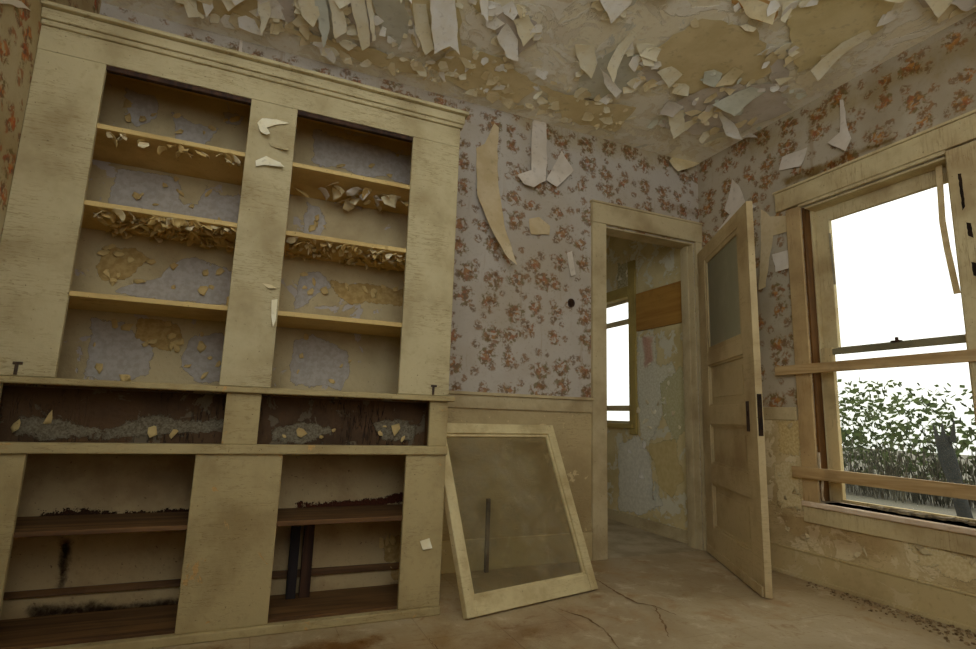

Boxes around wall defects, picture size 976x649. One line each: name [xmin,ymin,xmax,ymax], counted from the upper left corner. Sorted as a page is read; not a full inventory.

peeling [917,0,976,23]
peeling [175,0,904,147]
peeling [106,112,241,167]
peeling [256,118,289,167]
peeling [93,169,241,306]
peeling [285,129,411,309]
peeling [83,318,224,383]
peeling [289,333,352,391]
peeling [11,410,224,441]
flaking render [618,332,676,516]
crack [561,609,619,648]
crack [598,580,676,637]